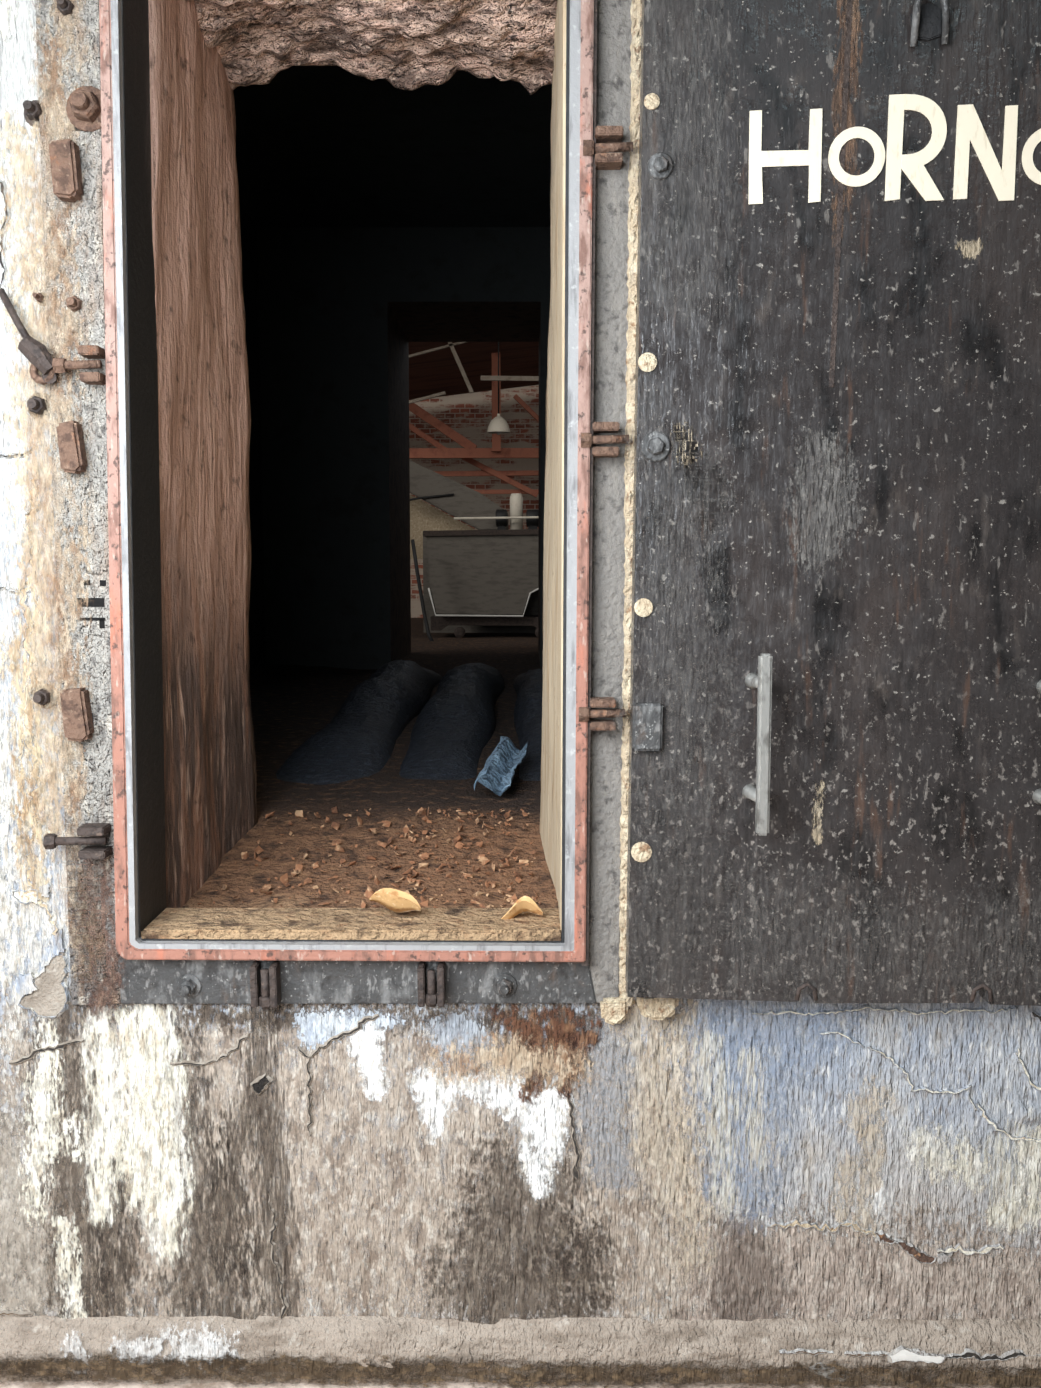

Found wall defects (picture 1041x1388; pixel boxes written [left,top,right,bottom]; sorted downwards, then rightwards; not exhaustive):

crack [0,173,12,324]
crack [0,445,37,459]
crack [0,586,19,594]
leakage [0,542,1041,1373]
crack [1030,1010,1041,1023]
crack [9,1038,85,1065]
crack [170,1033,251,1066]
corrosion [423,1004,602,1104]
crack [819,1030,1041,1143]
crack [0,1309,33,1317]